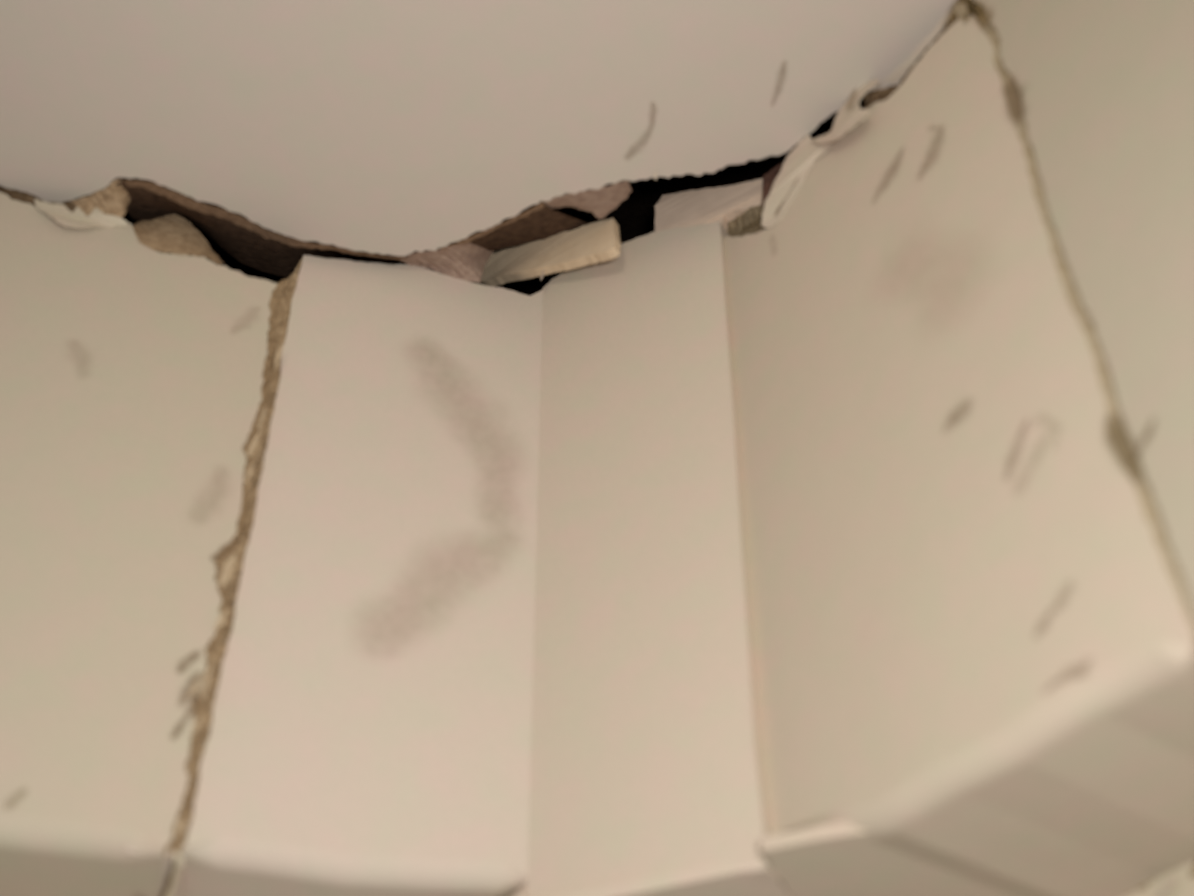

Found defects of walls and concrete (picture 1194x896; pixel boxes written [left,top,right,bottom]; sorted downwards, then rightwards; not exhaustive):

crack [0,186,127,229]
flaking render [70,178,494,283]
spalling [495,271,564,296]
spalling [501,79,895,244]
crack [863,11,1194,630]
crack [161,257,303,896]